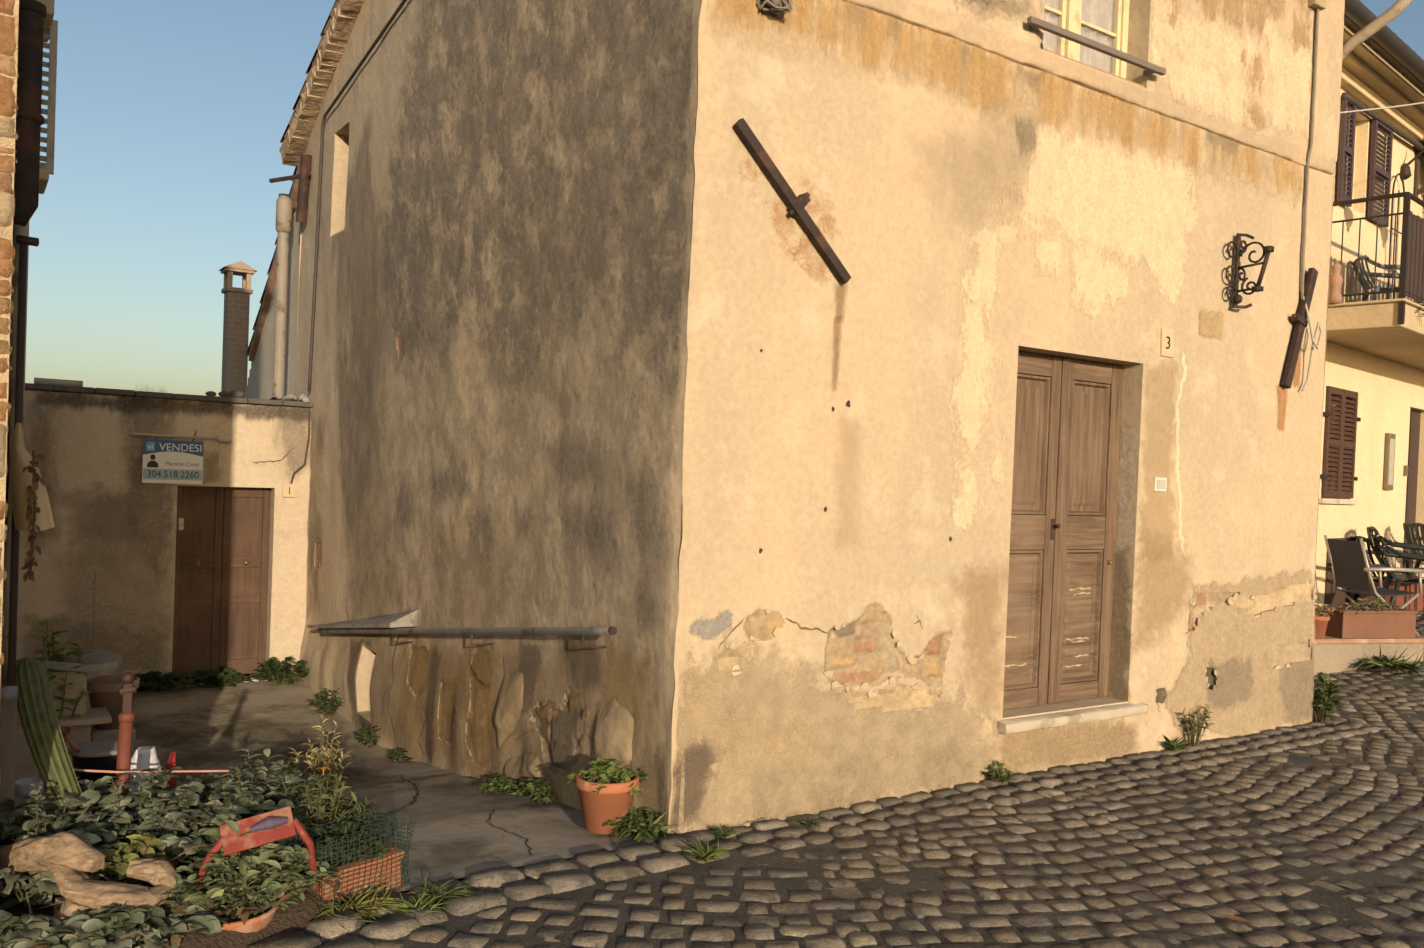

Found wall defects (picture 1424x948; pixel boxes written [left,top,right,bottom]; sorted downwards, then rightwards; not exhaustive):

rust [773,190,834,278]
water stain [337,0,1312,509]
rust [835,287,844,378]
water stain [32,394,321,572]
water stain [309,505,318,598]
flaking render [712,607,786,676]
flaking render [823,602,953,715]
peeling [1156,570,1317,737]
flaking render [465,646,494,769]
flaking render [527,685,589,775]
crack [486,809,532,855]